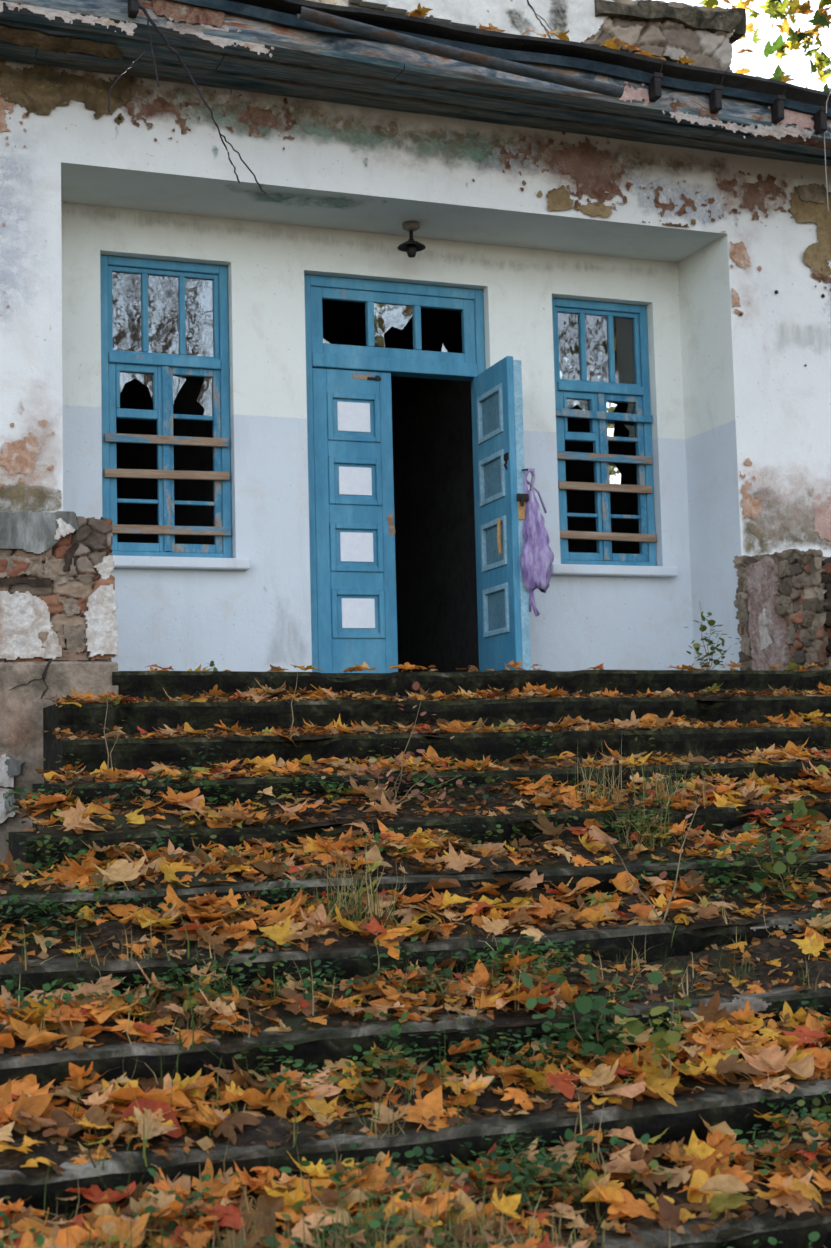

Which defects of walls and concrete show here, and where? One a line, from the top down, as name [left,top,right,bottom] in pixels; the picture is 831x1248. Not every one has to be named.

spalling [0,60,200,148]
peeling [214,89,304,150]